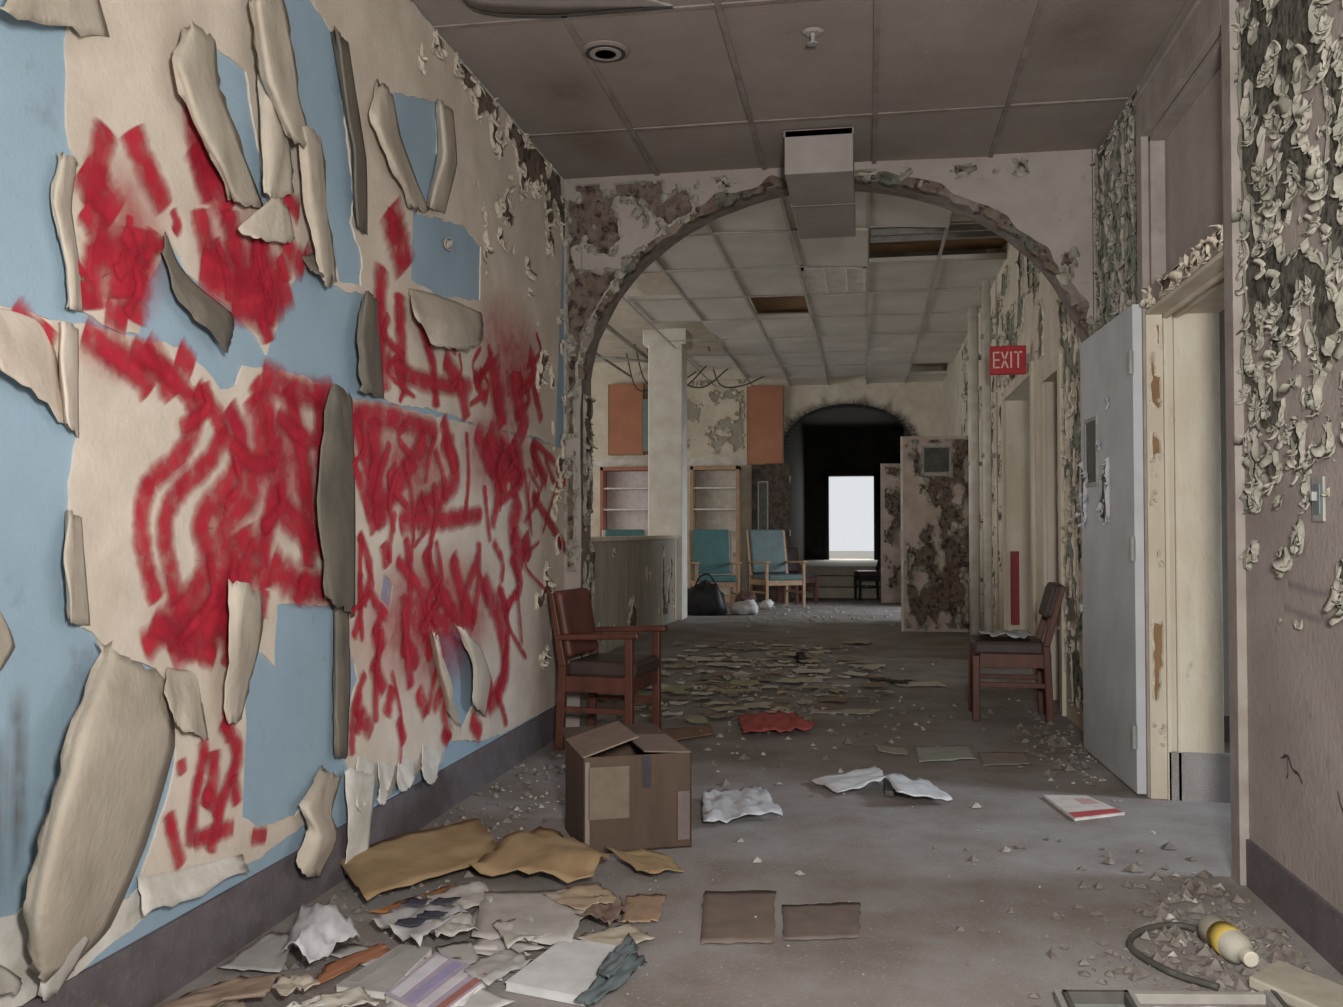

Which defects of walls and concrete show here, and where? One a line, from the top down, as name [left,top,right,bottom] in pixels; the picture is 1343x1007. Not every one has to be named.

peeling [0,0,788,1007]
peeling [854,0,1343,714]